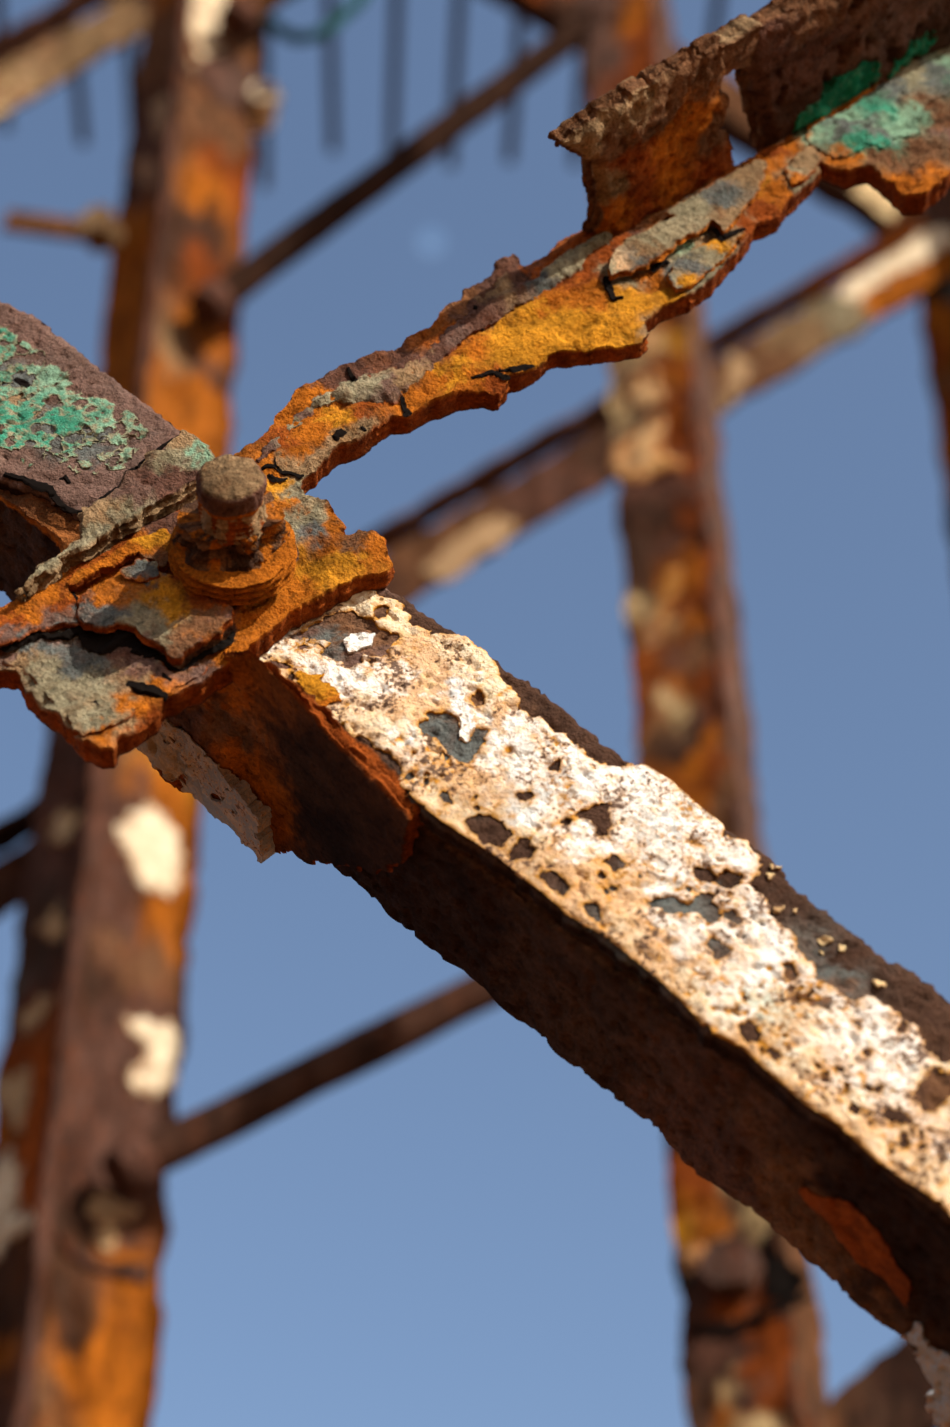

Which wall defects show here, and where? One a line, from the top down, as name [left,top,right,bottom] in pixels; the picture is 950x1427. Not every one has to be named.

peeling [792,30,950,159]
rust [607,59,914,294]
peeling [0,325,149,475]
rust [0,528,235,737]
rust [296,670,342,707]
peeling [423,515,517,583]
peeling [637,566,686,653]
peeling [260,590,950,1214]
rust [17,1048,53,1226]
rust [798,1186,912,1307]